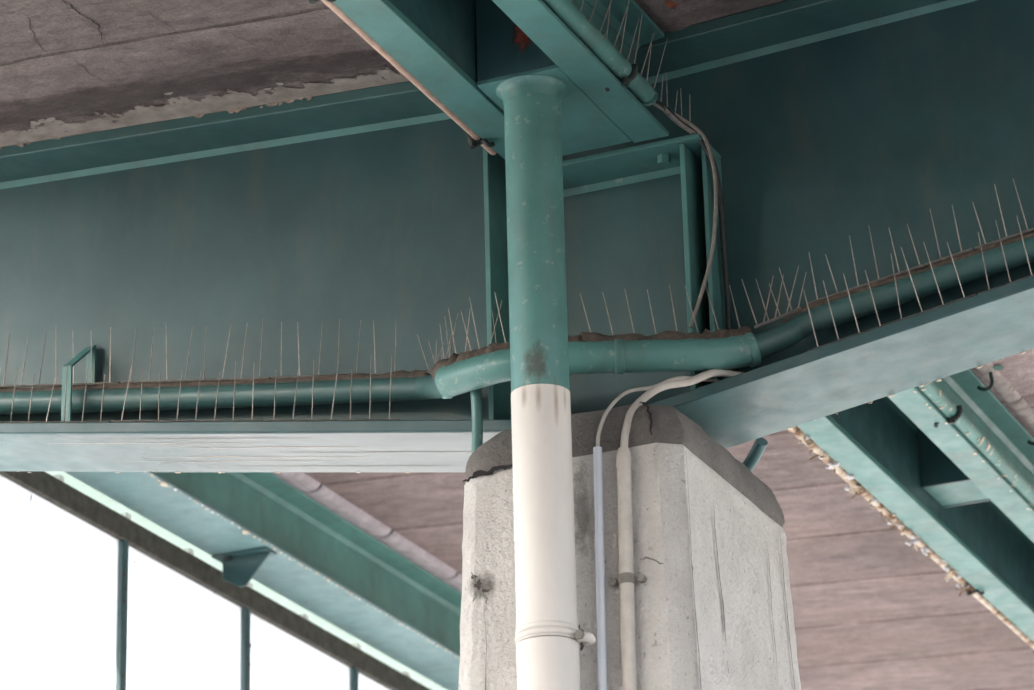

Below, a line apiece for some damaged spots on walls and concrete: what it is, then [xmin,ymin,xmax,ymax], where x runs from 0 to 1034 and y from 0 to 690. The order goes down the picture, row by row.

crack [1,0,330,83]
rust [513,25,530,50]
damp [0,51,386,128]
peeling [0,67,409,149]